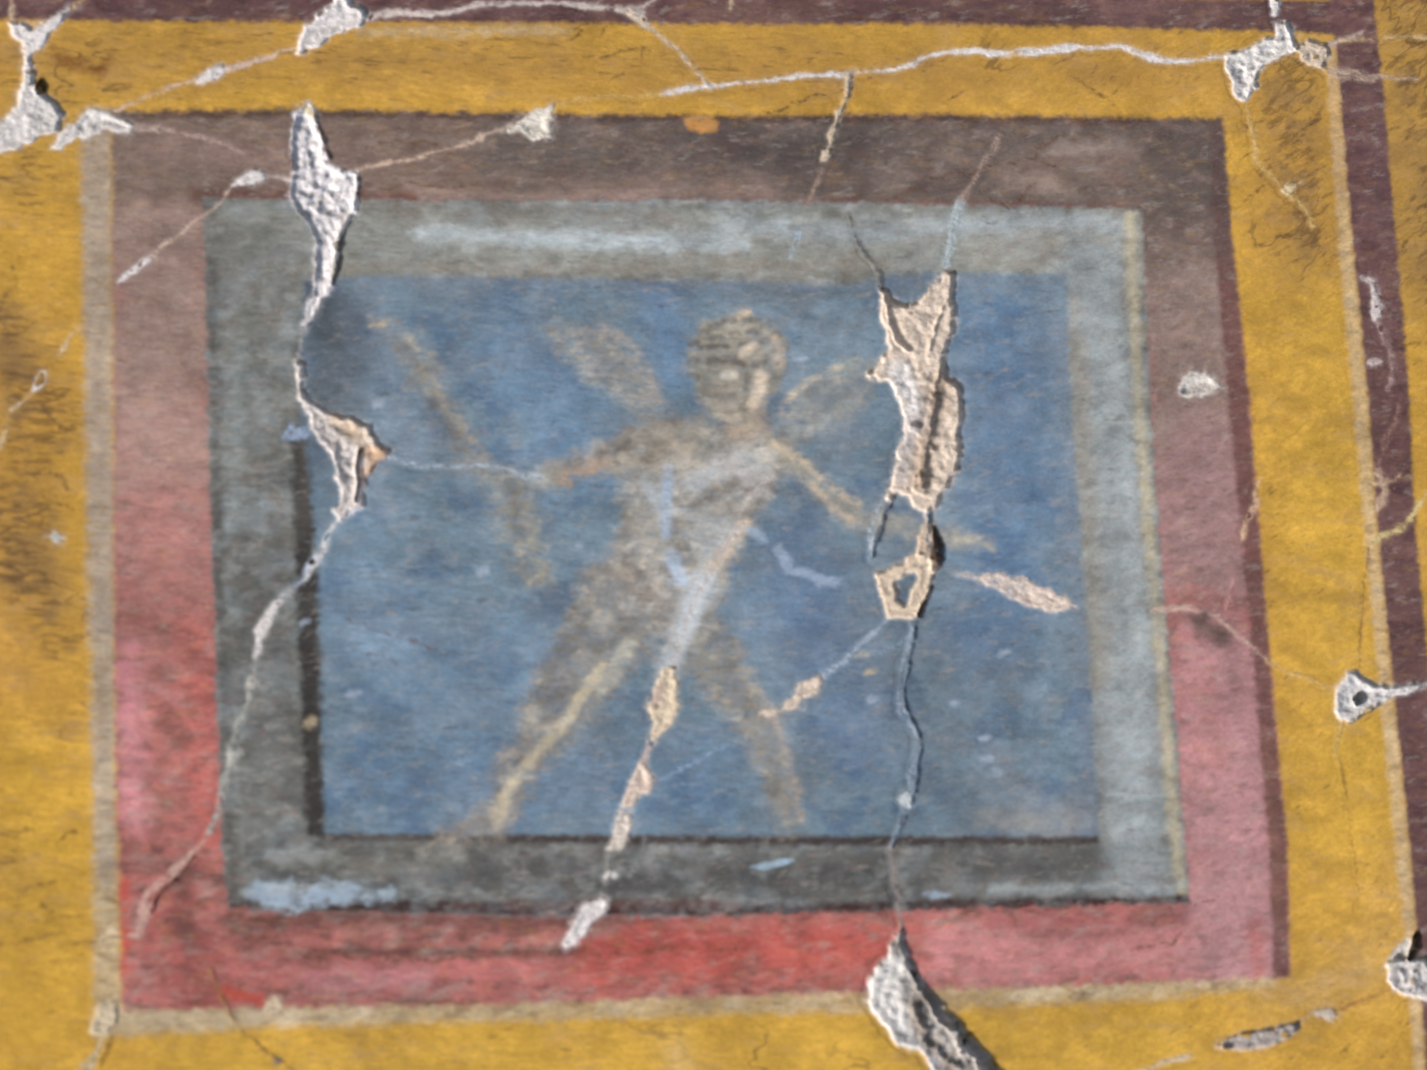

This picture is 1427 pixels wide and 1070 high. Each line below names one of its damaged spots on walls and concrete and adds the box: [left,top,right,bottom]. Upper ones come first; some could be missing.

spalling [0,0,250,161]
crack [106,43,293,117]
crack [113,164,291,290]
spalling [277,97,548,527]
spalling [289,0,717,95]
crack [352,17,1223,293]
spalling [860,264,1080,624]
spalling [1219,0,1427,233]
crack [1354,202,1427,549]
crack [0,494,368,949]
crack [205,471,927,1070]
spalling [857,921,1009,1070]